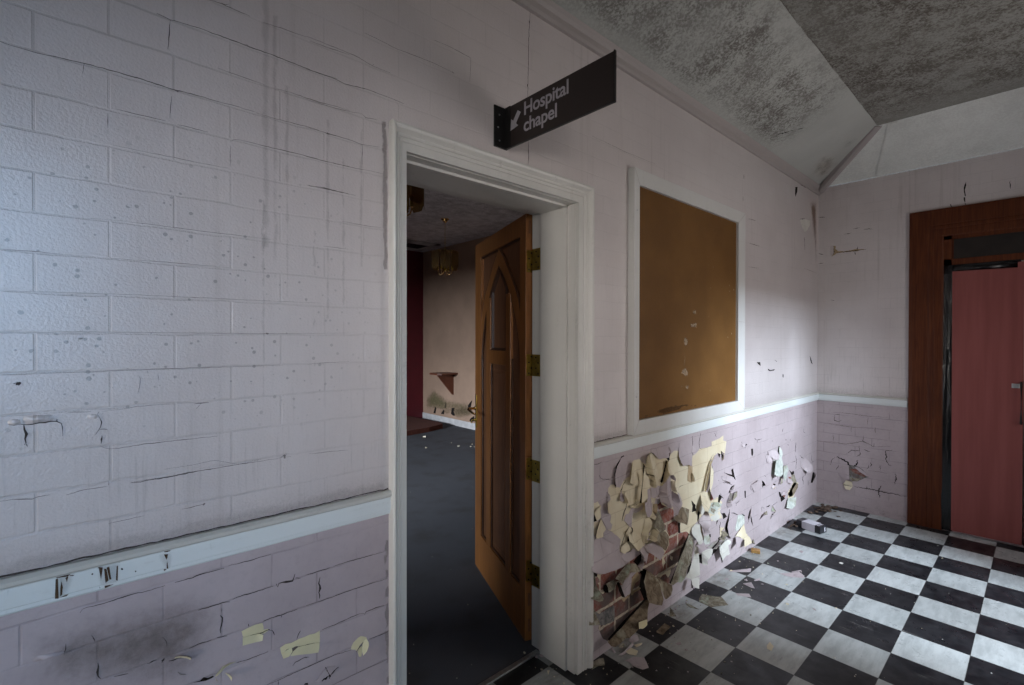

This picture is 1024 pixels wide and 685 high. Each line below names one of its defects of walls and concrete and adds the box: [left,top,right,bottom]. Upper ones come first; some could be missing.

peeling [589,436,816,655]